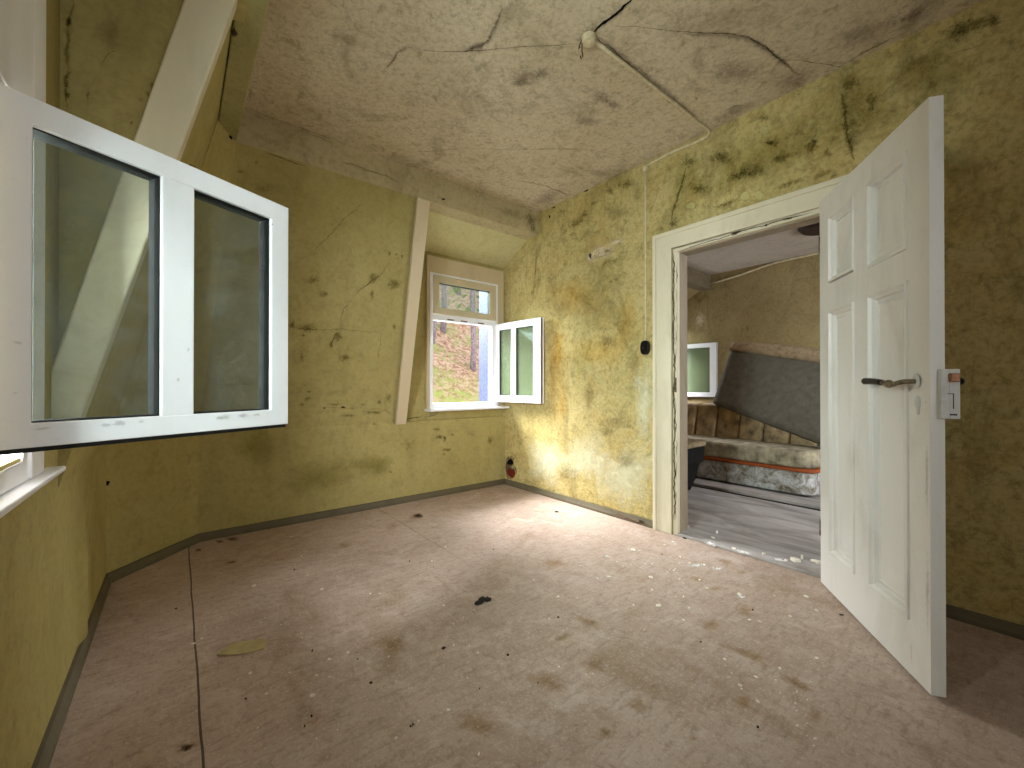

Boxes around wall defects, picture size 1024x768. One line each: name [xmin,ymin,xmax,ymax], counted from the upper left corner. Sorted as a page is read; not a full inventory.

spalling [505,456,517,480]